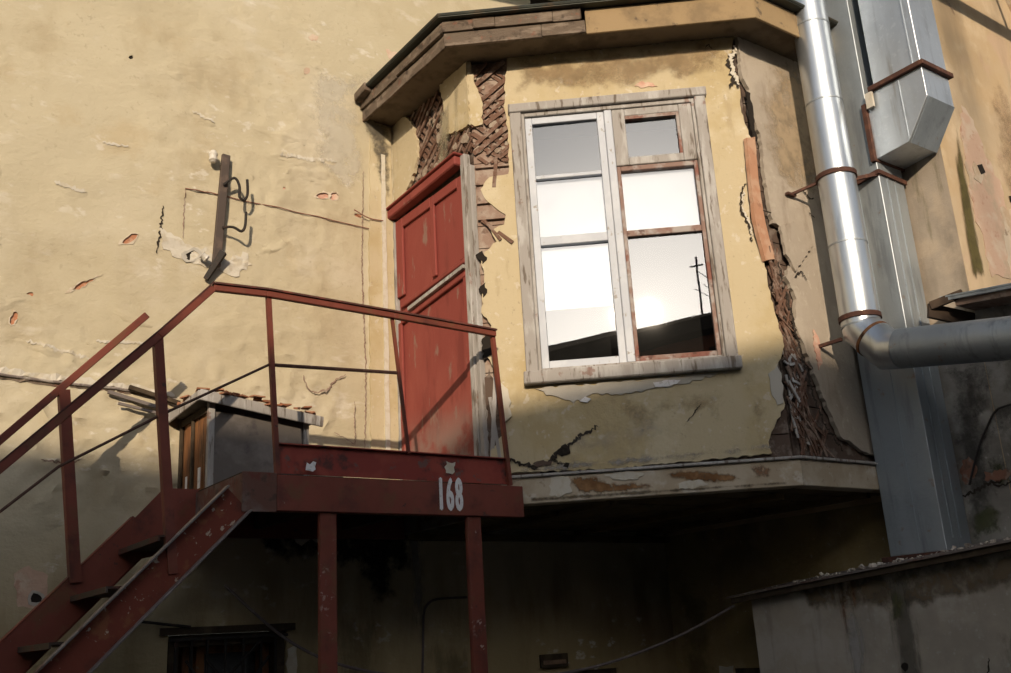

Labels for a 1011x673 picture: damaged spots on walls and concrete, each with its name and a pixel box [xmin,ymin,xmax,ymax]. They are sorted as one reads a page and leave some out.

crack [156,189,208,253]
flaking render [159,227,252,277]
flaking render [475,159,514,244]
flaking render [743,137,813,272]
peeling [960,105,1011,279]
peeling [813,329,823,370]
flaking render [536,371,730,403]
crack [510,425,598,470]
peeling [671,471,735,489]
water stain [803,555,1011,673]